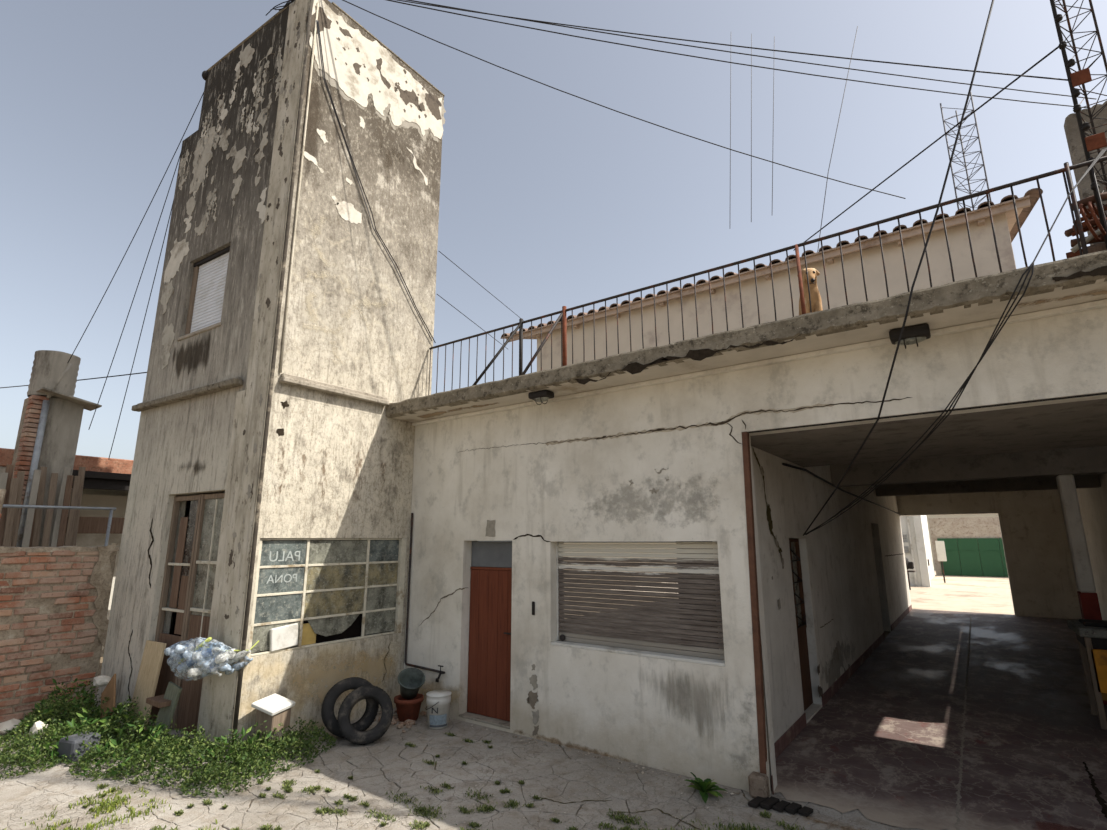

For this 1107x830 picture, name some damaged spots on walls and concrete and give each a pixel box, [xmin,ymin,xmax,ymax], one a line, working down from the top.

peeling [160,0,446,370]
spalling [1052,267,1107,281]
spalling [575,335,800,385]
crack [460,397,912,569]
spalling [228,518,245,569]
crack [419,587,468,626]
peeling [527,664,539,736]
crack [954,616,972,830]
crack [544,798,701,830]
crack [1082,762,1107,818]